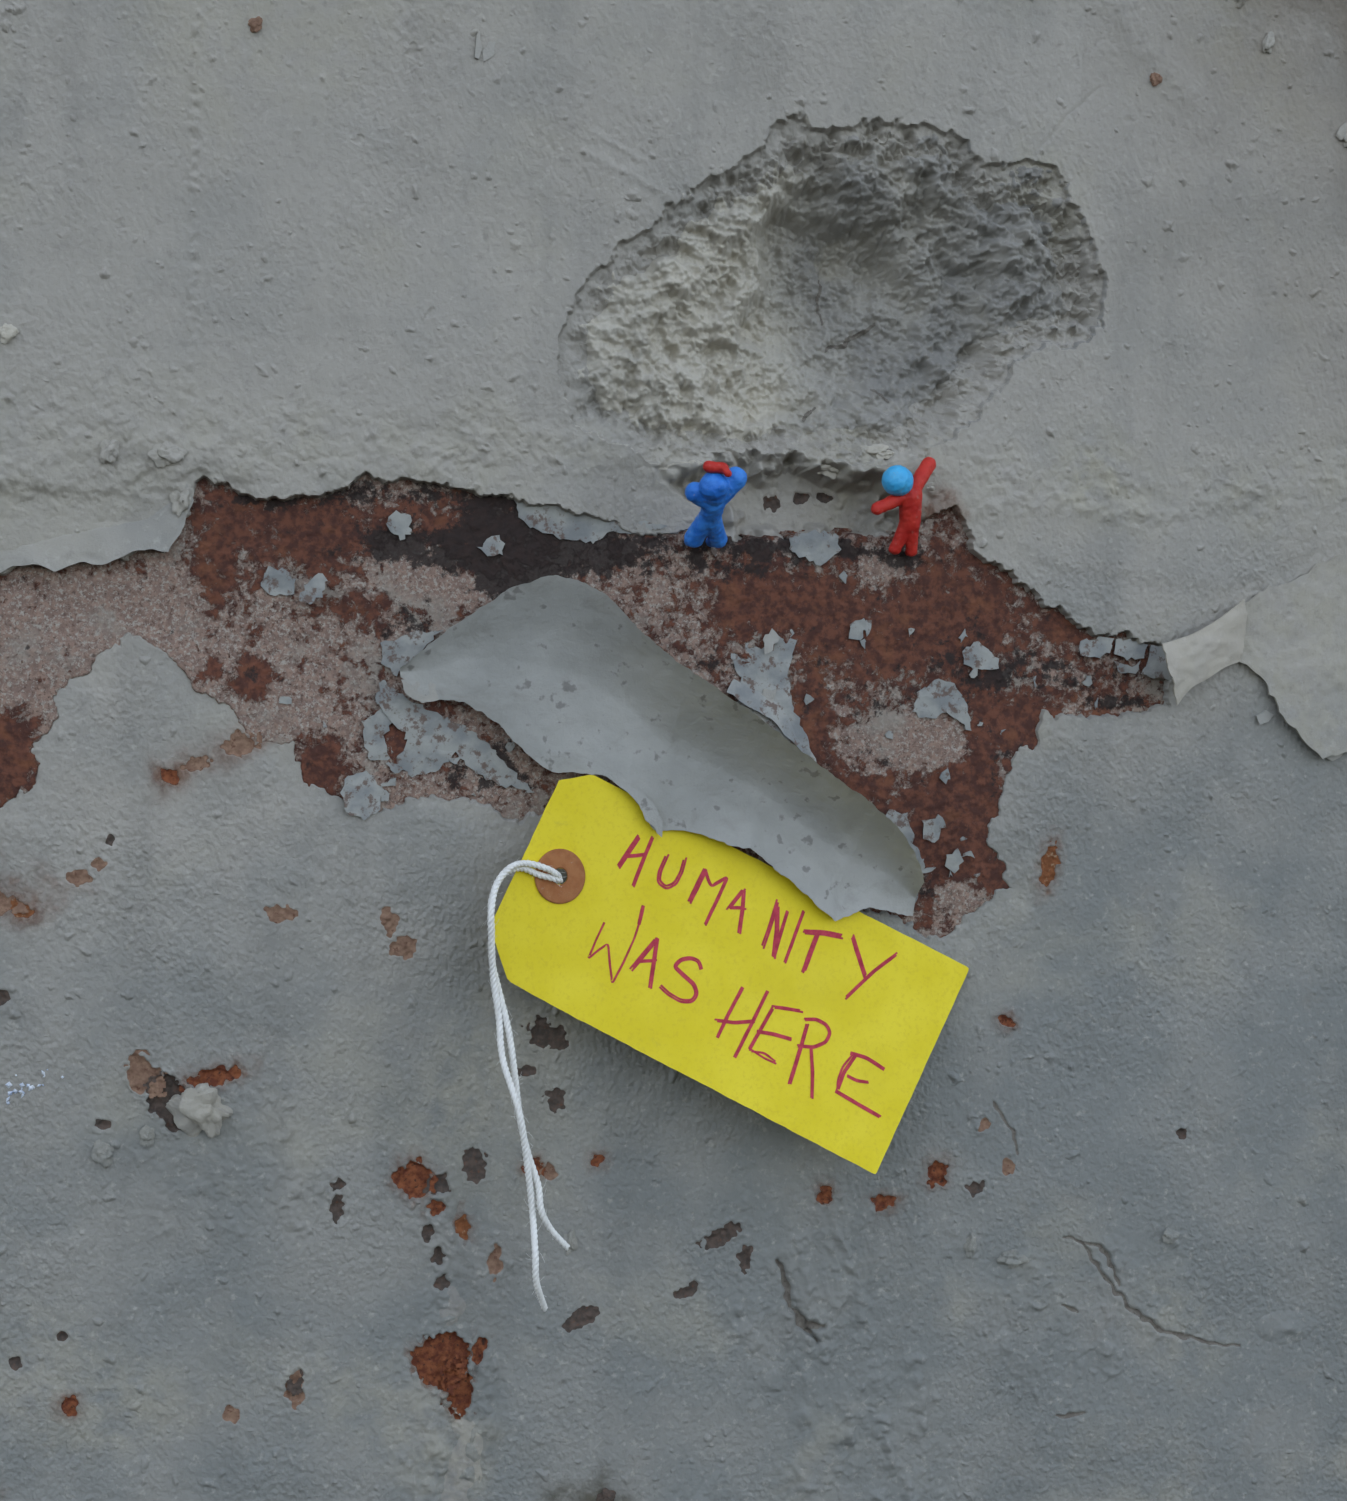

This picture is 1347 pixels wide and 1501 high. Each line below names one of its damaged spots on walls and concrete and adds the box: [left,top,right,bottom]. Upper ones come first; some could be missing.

rust [0,474,1172,938]
spalling [180,729,262,772]
peeling [400,575,924,921]
spalling [263,904,298,924]
spalling [380,906,417,960]
rust [179,1065,241,1093]
rust [391,1157,471,1240]
crack [1061,1236,1241,1347]
rust [410,1332,488,1419]